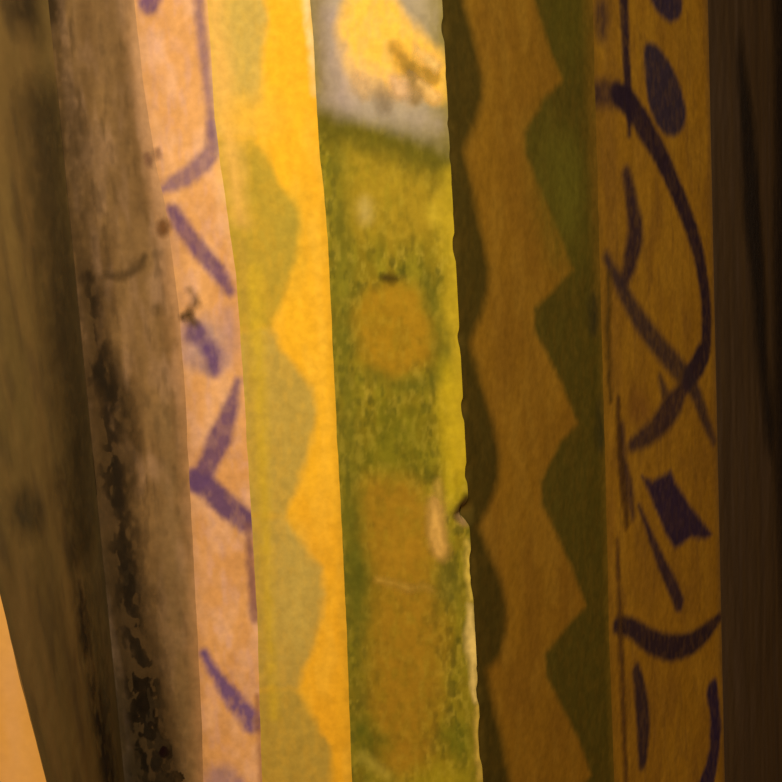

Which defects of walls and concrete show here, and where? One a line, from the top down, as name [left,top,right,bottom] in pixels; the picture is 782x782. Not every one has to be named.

leakage [93,344,168,782]